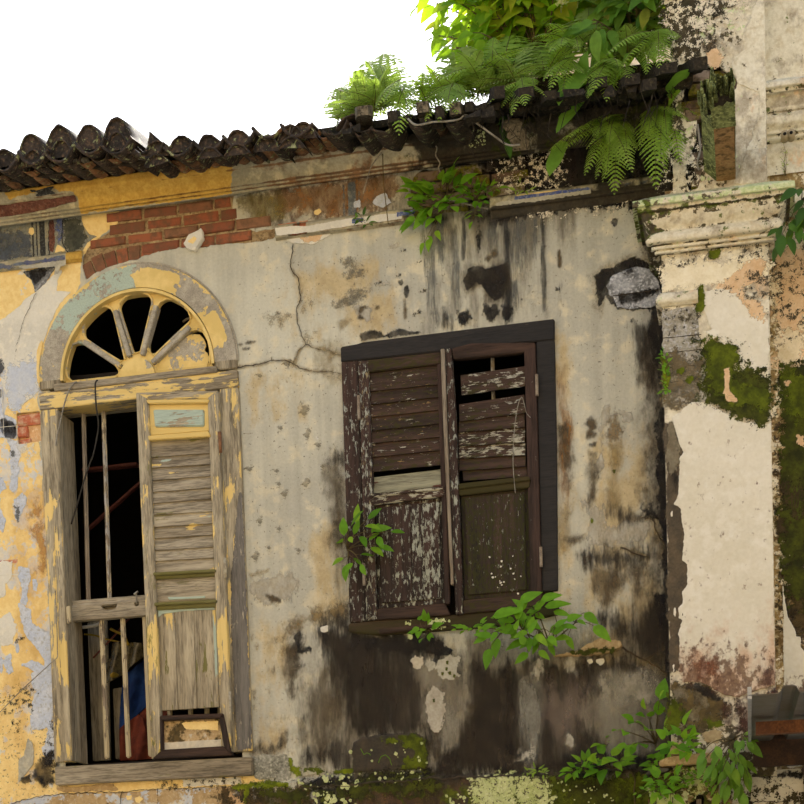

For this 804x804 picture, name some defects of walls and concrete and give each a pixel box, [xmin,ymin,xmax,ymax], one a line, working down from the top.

flaking render [681,0,768,190]
leakage [478,138,658,195]
crack [237,245,341,374]
spalling [0,164,591,533]
leakage [396,201,633,322]
peeling [0,559,53,730]
peeling [250,572,299,605]
leakage [217,305,748,804]
flaking render [594,225,804,697]
leakage [773,470,804,546]
leakage [783,584,804,650]
spalling [10,777,263,804]